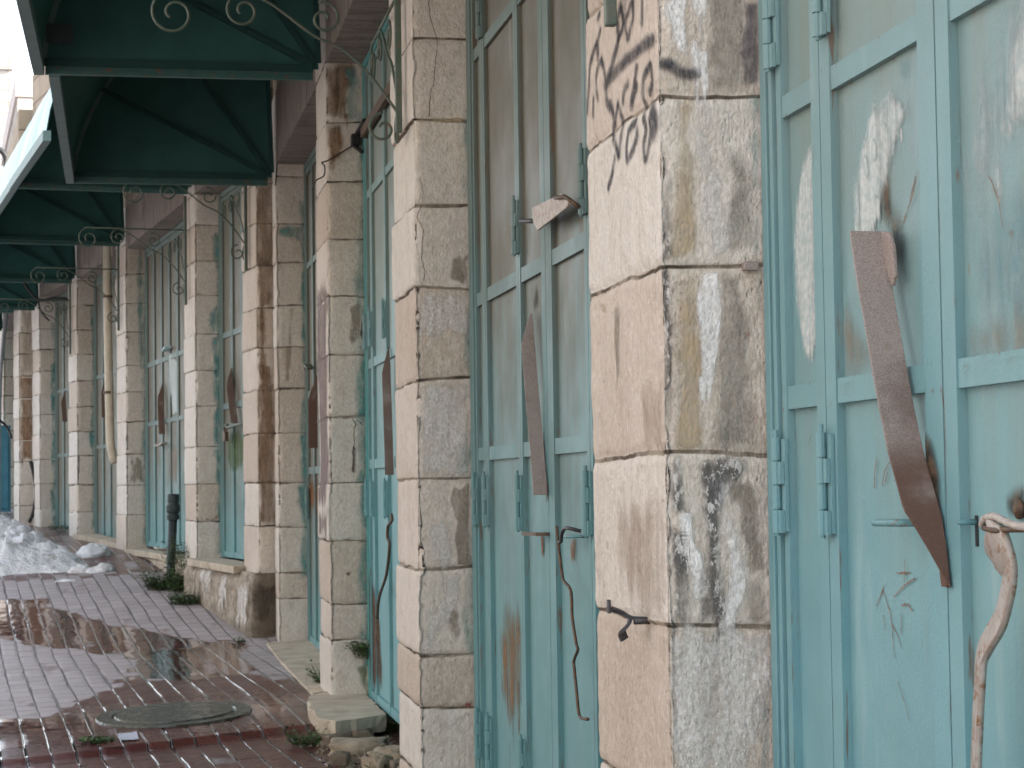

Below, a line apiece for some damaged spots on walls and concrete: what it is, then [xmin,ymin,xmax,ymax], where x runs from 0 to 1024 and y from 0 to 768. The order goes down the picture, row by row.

crack [428,0,438,117]
crack [406,179,425,281]
rust [502,615,520,727]
damp [672,483,770,768]